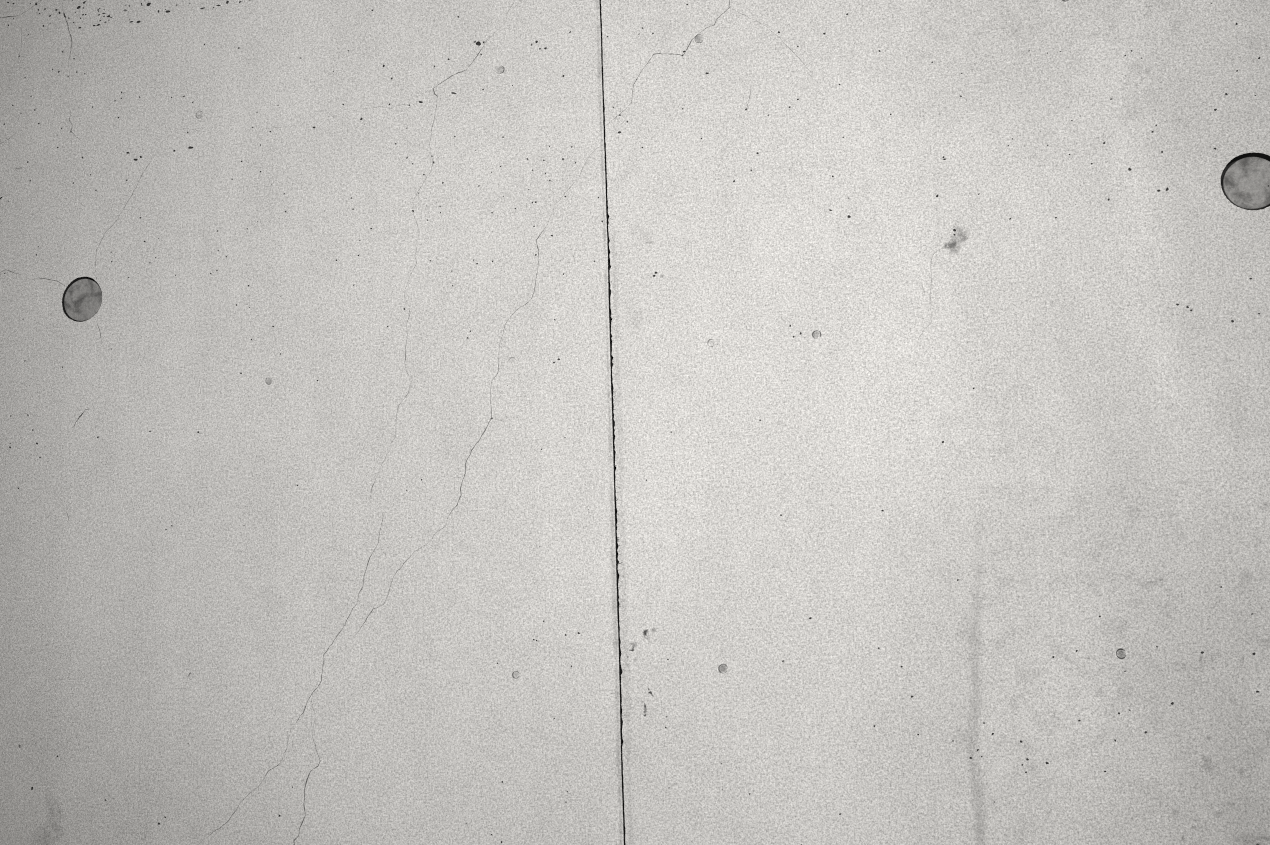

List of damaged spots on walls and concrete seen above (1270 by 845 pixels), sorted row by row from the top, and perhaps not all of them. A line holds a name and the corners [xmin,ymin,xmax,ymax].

crack [3,0,72,69]
crack [199,0,810,844]